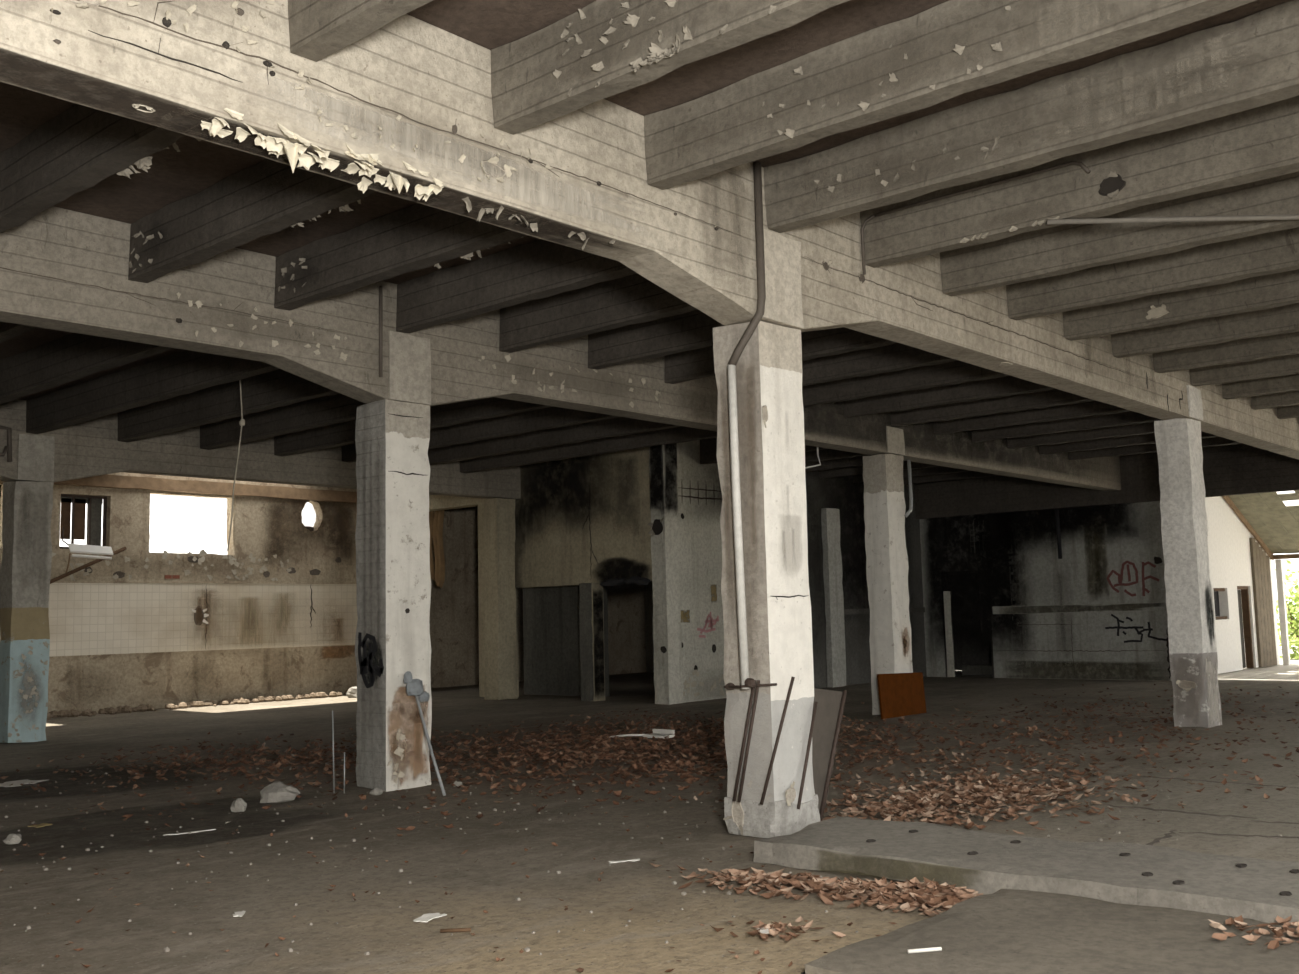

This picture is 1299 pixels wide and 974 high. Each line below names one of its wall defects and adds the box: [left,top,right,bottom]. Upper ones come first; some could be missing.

peeling [553,2,693,88]
peeling [117,108,444,228]
spalling [1098,171,1126,199]
leakage [1007,505,1161,613]
leakage [1009,661,1159,680]
corrosion [389,687,428,783]